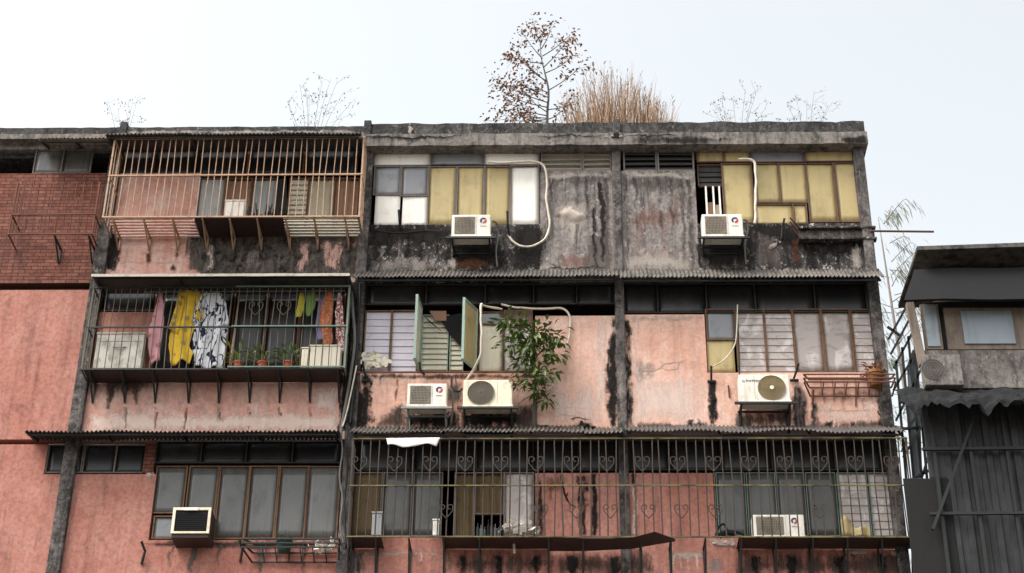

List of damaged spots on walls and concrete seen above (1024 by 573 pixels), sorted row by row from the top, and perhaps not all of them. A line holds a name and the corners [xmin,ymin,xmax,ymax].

water stain [548,173,611,270]
water stain [622,172,690,196]
water stain [186,223,546,430]
water stain [589,316,718,432]